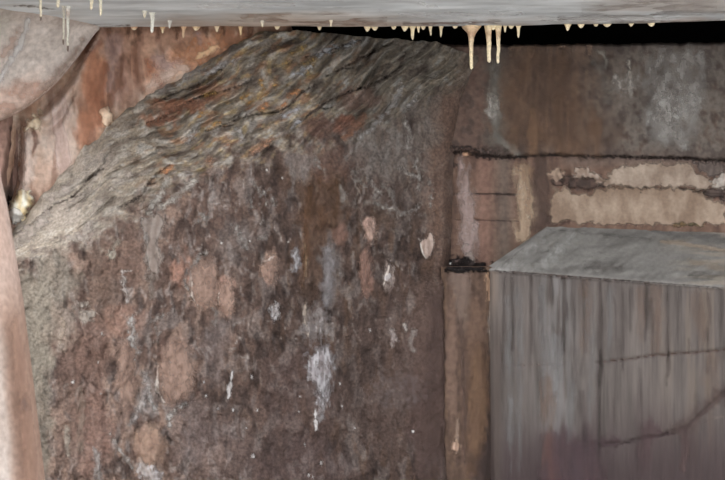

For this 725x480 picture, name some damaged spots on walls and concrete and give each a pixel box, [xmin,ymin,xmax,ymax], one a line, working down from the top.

efflorescence [196,38,220,59]
efflorescence [487,62,518,154]
efflorescence [613,49,705,148]
crack [450,145,725,167]
peeling [547,161,725,227]
crack [597,349,725,363]
crack [599,387,725,472]